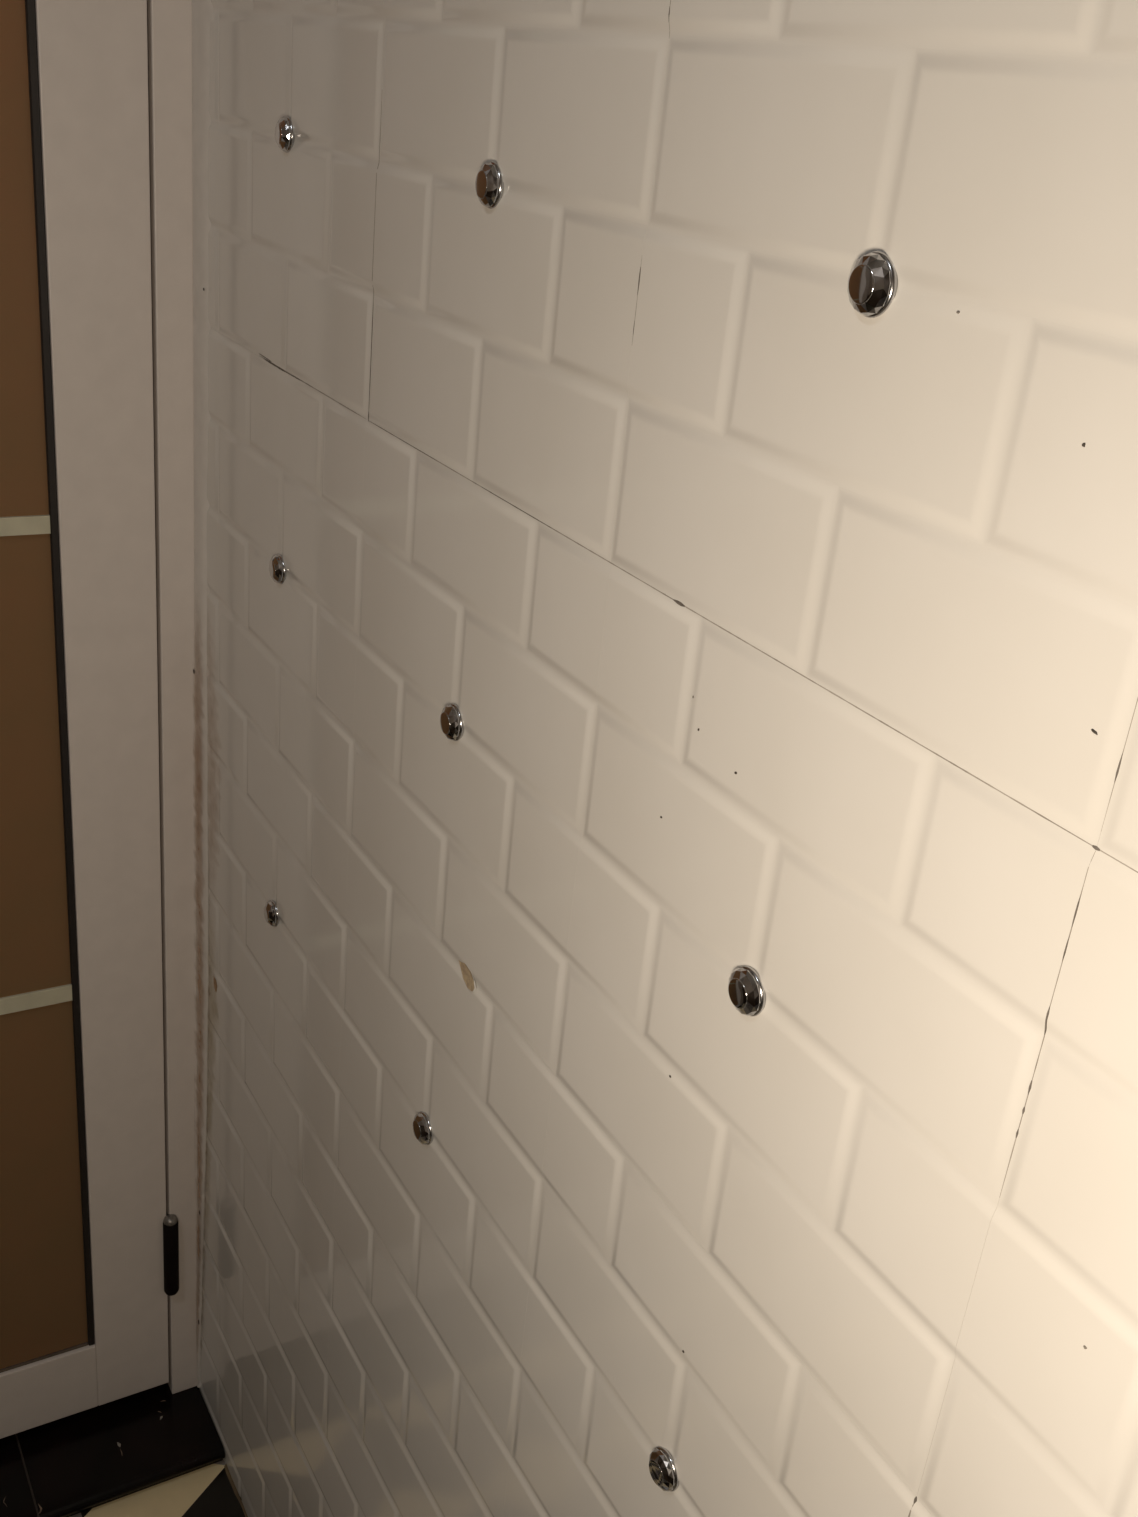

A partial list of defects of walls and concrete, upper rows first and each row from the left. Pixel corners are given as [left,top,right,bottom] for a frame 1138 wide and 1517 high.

crack [260,101,1138,1198]